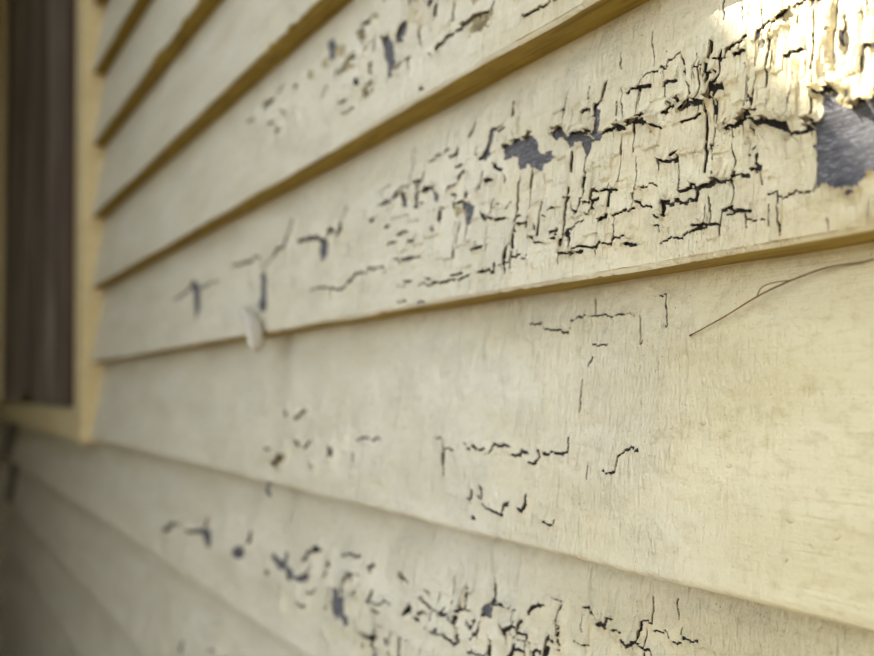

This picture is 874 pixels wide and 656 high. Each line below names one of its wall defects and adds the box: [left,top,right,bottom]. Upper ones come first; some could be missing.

peeling [157,0,874,352]
peeling [151,388,802,656]
crack [424,273,699,554]